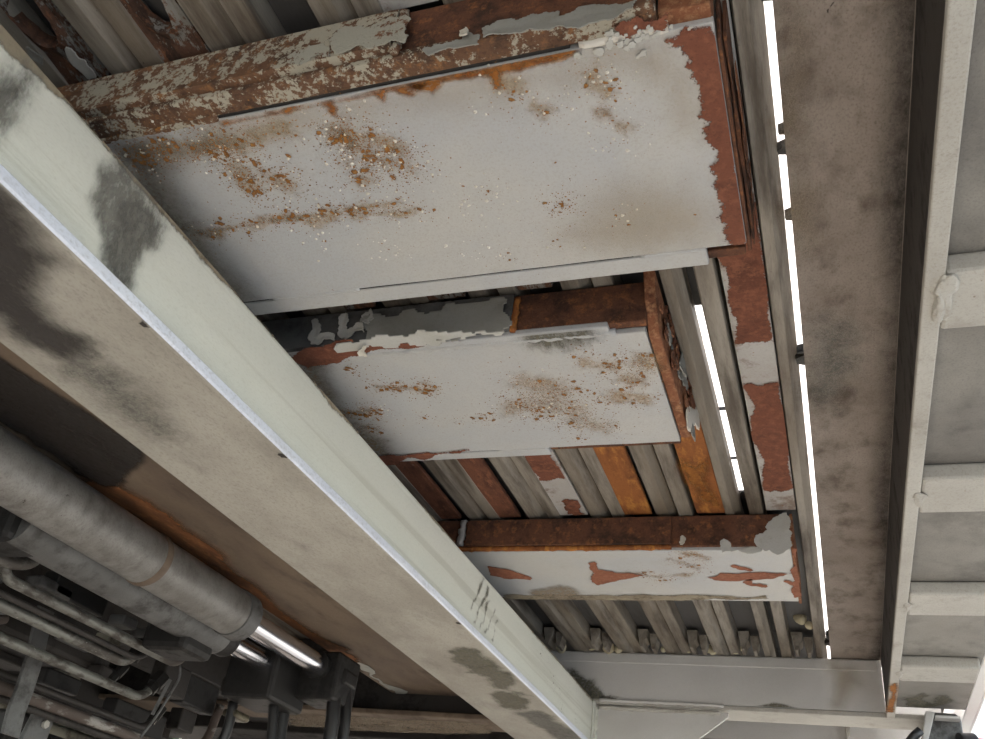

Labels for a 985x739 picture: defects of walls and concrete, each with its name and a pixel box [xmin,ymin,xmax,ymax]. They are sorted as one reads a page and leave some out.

peeling [422,0,677,59]
water stain [0,24,243,301]
rust [110,12,774,344]
water stain [0,358,144,487]
water stain [0,189,164,435]
peeling [308,297,512,357]
rust [291,303,696,443]
rust [525,455,565,481]
rust [82,477,358,663]
peeling [588,562,643,585]
peeling [709,513,801,598]
water stain [449,648,578,739]